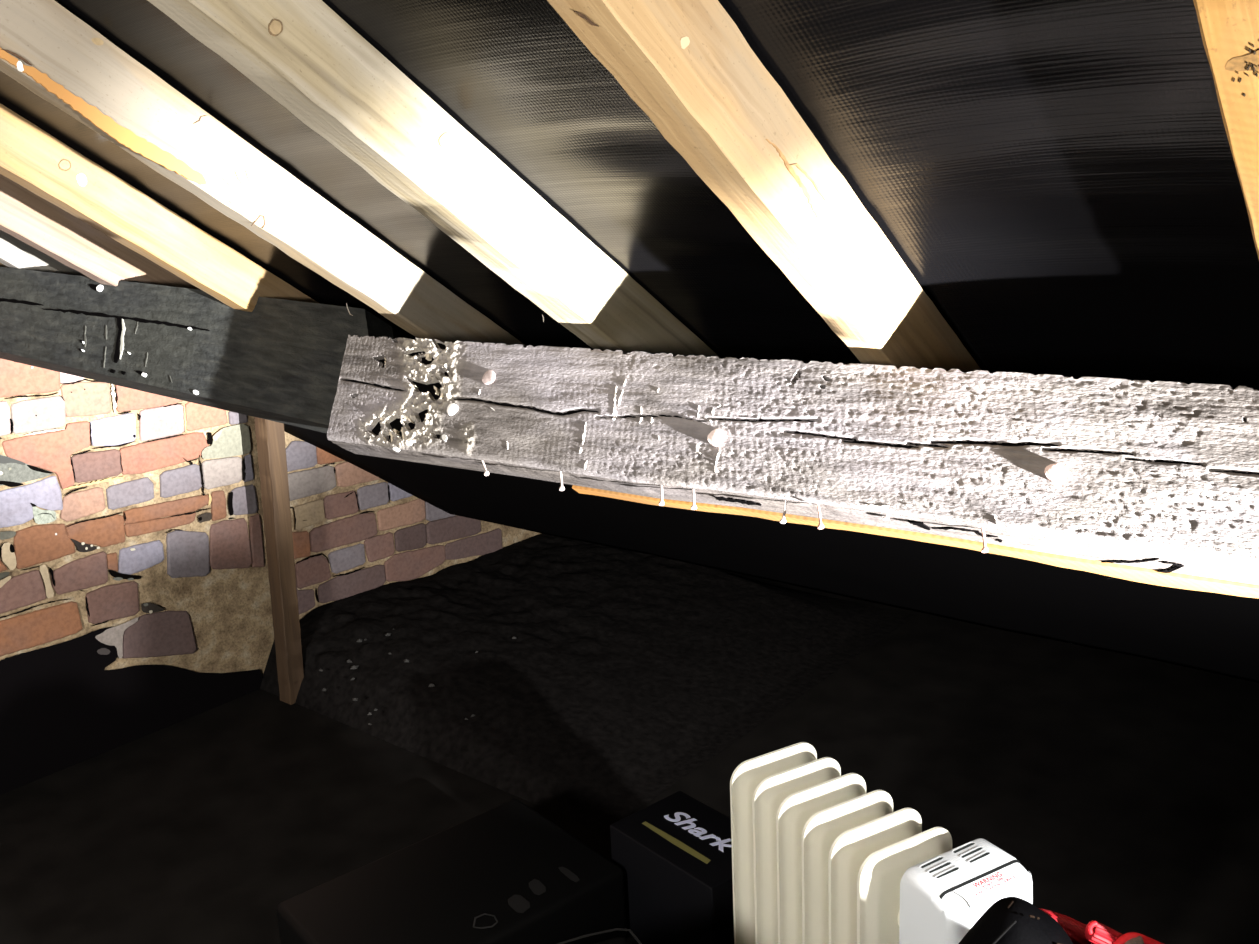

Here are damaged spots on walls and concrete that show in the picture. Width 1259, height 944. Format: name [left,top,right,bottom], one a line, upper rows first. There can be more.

damp [1225,45,1259,97]
crack [454,398,1259,475]
crack [712,495,761,506]
crack [908,520,998,537]
crack [1101,558,1184,579]